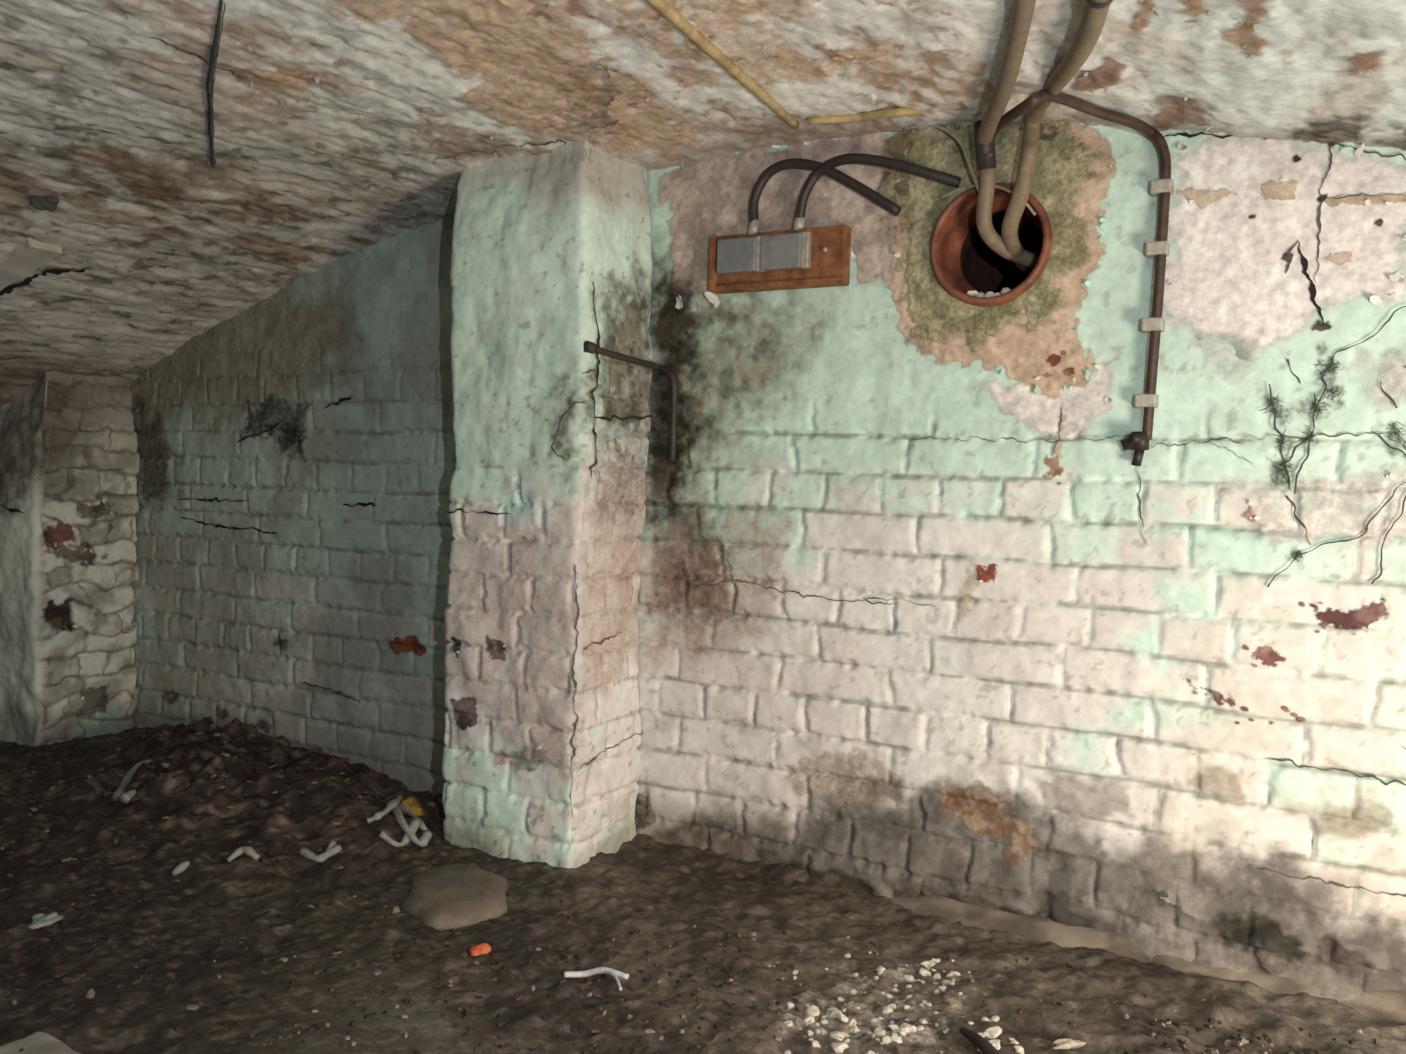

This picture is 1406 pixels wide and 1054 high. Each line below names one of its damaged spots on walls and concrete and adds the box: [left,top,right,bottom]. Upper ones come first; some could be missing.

peeling [235,67,328,115]
peeling [1072,58,1127,94]
flaking render [331,0,1117,441]
peeling [1148,96,1406,378]
crack [1164,132,1406,331]
spalling [43,597,79,631]
spalling [44,499,117,566]
leakage [131,287,353,506]
spalling [450,697,478,730]
leakage [552,271,720,622]
peeling [1354,351,1406,409]
leakage [652,748,1406,1001]